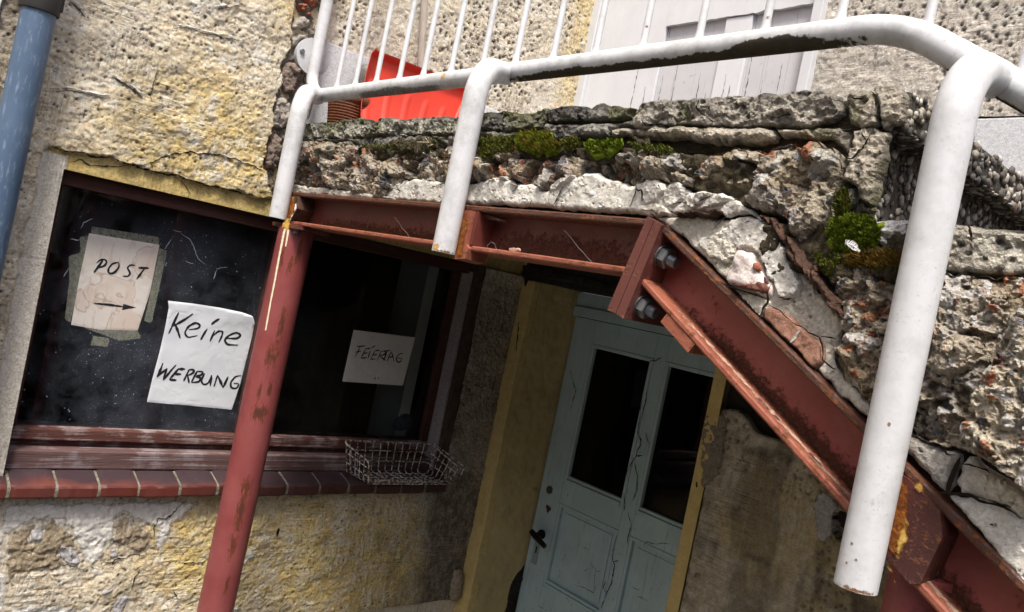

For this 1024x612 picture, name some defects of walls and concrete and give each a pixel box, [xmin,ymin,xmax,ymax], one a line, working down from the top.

crack [52,146,270,200]
rust [323,216,467,257]
rust [498,230,631,267]
crack [720,281,836,372]
rust [252,307,288,425]
peeling [696,414,726,489]
flaking render [6,518,80,589]
flaking render [109,518,151,560]
crack [559,392,667,607]
peeling [814,493,842,542]
rust [888,481,922,555]
crack [938,491,1021,526]